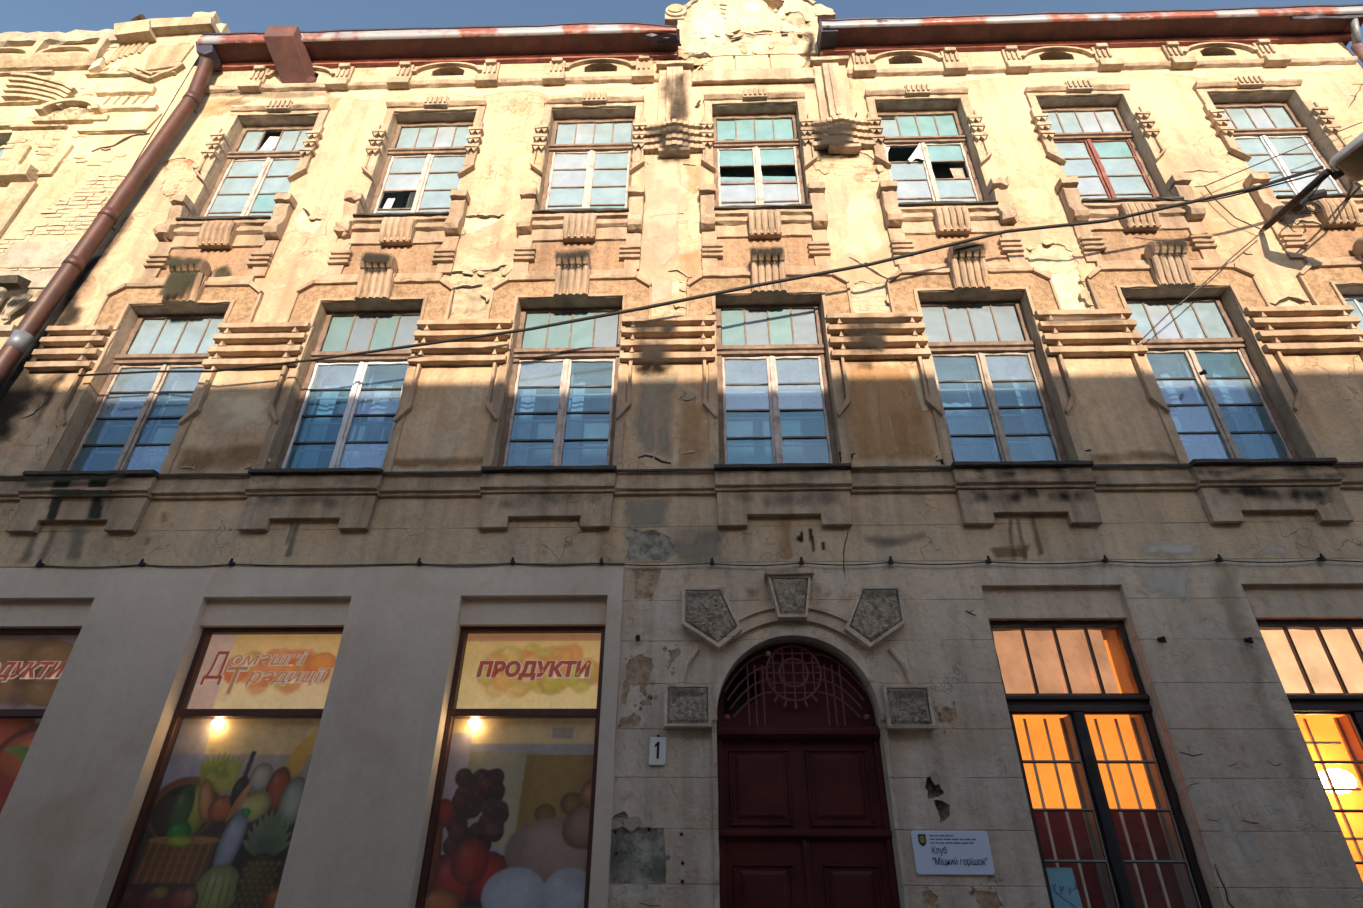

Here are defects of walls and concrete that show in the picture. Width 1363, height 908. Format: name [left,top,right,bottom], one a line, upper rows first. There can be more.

flaking render [681,0,811,66]
peeling [445,265,512,319]
flaking render [1026,239,1094,310]
water stain [29,374,65,407]
peeling [620,527,675,602]
spalling [925,771,950,822]
peeling [609,811,684,889]
peeling [969,874,1004,908]